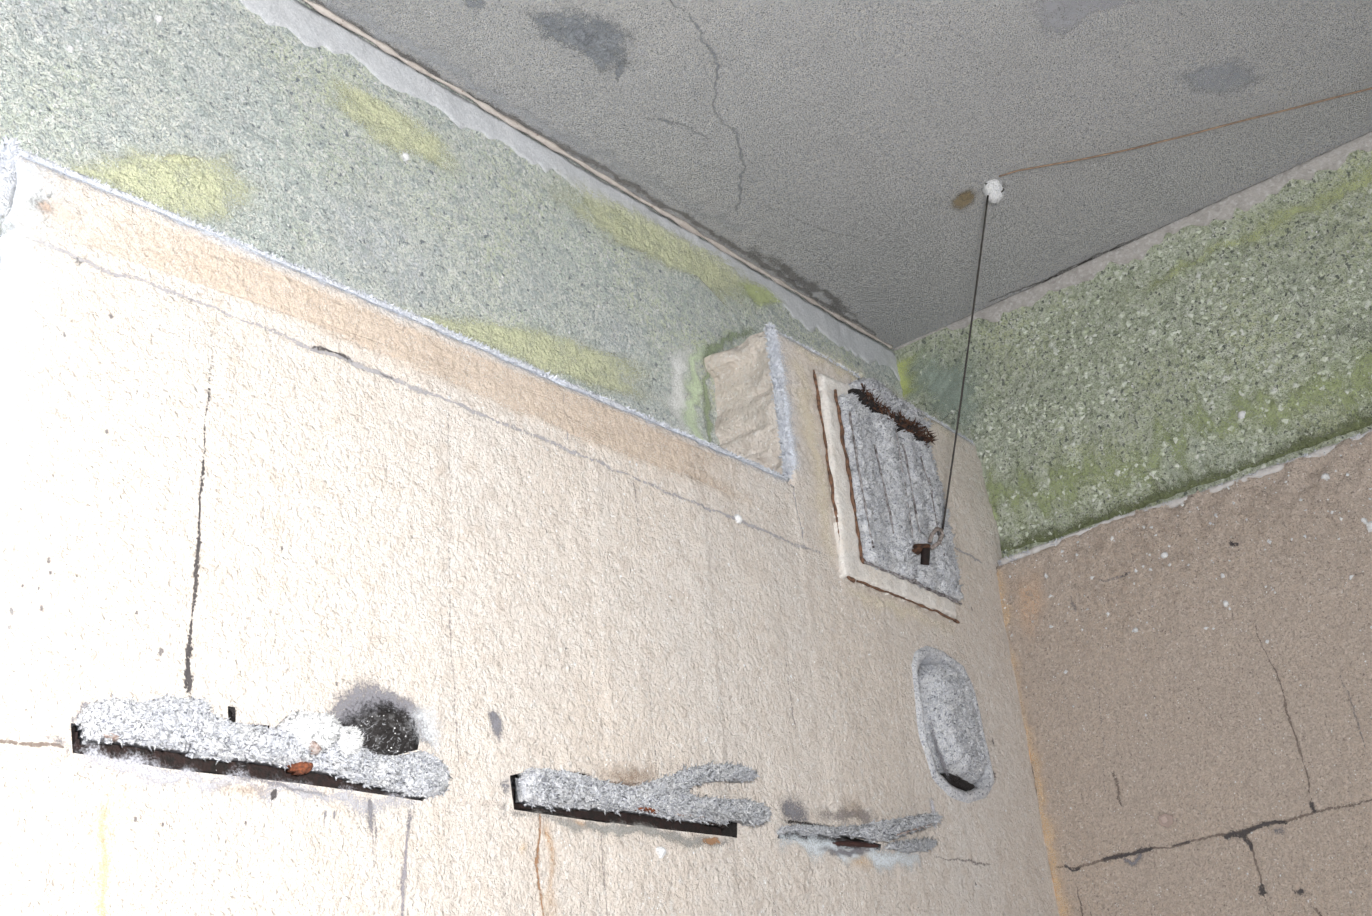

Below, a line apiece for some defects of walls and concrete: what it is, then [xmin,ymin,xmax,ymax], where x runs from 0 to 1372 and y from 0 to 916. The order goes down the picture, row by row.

leakage [313,0,868,329]
crack [658,0,746,210]
crack [24,233,820,697]
rust [807,358,962,624]
leakage [986,349,1372,518]
rust [535,814,545,916]
crack [1055,620,1372,916]